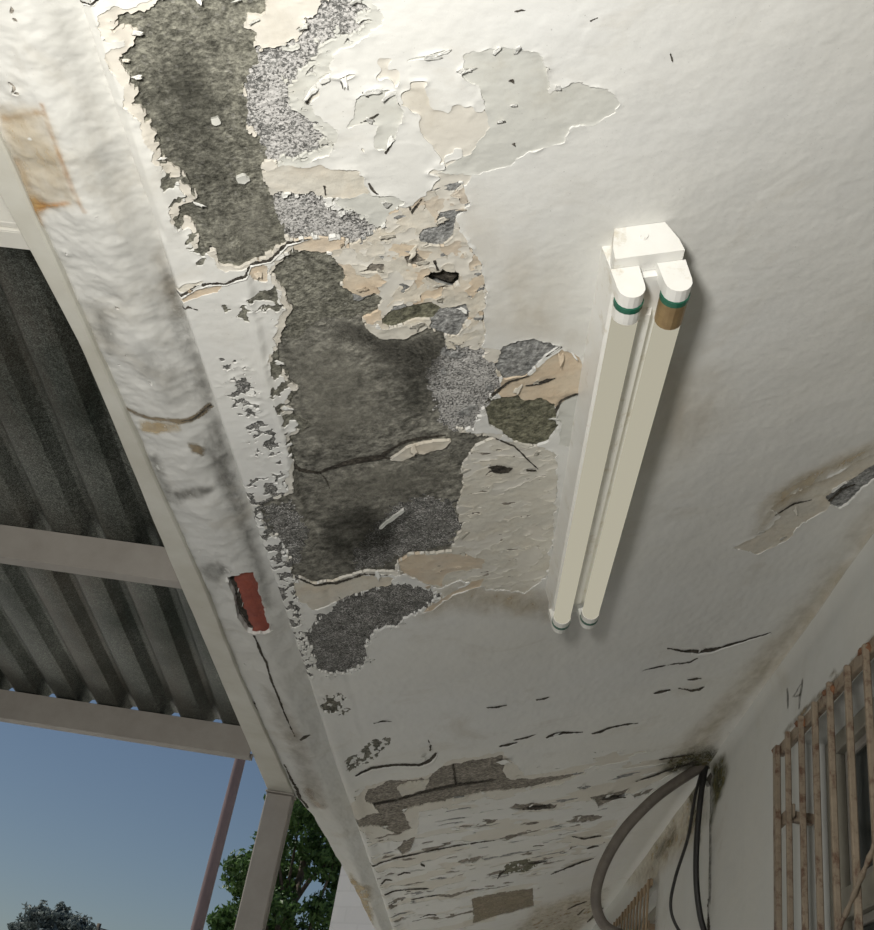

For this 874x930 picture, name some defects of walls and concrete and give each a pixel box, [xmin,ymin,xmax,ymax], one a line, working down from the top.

crack [177,239,310,310]
spalling [98,0,620,680]
crack [127,403,213,455]
crack [294,434,446,489]
peeling [733,453,874,554]
crack [253,635,310,741]
peeling [320,693,351,715]
crack [643,632,771,696]
damp [666,751,726,802]
peeling [350,751,676,930]